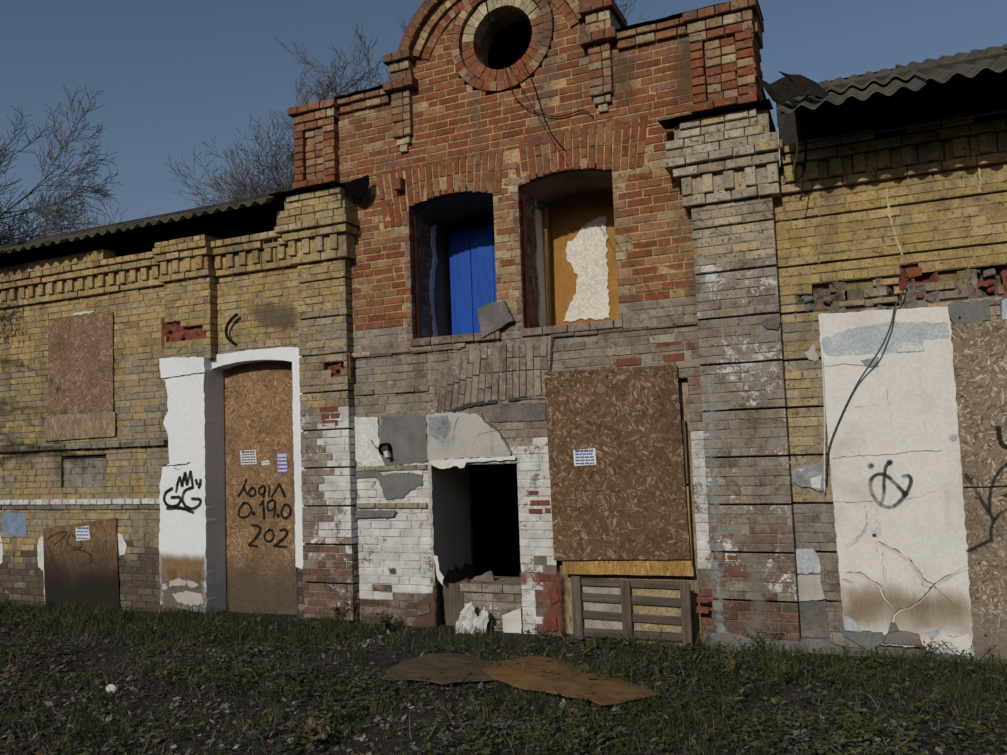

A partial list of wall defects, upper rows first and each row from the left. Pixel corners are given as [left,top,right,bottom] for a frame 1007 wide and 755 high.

spalling [161,318,208,349]
spalling [793,281,846,314]
peeling [822,263,950,367]
spalling [966,264,1007,319]
flaking render [320,406,340,426]
peeling [352,415,516,475]
flaking render [529,491,551,514]
water stain [156,556,207,614]
spalling [540,571,564,636]
crack [833,501,969,633]
water stain [850,591,965,627]